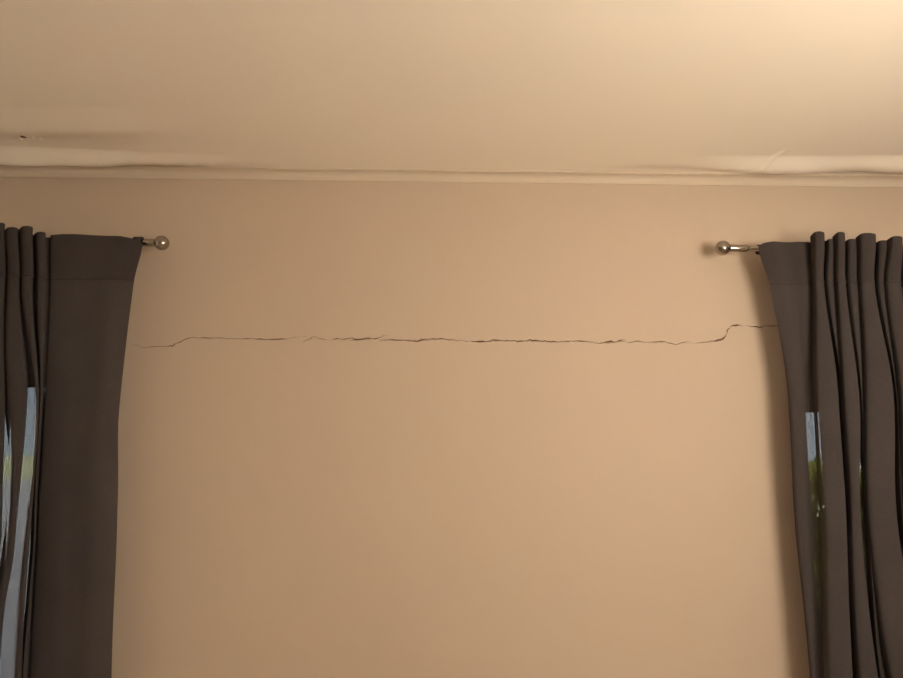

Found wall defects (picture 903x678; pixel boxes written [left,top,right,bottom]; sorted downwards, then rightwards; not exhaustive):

crack [140,324,778,348]